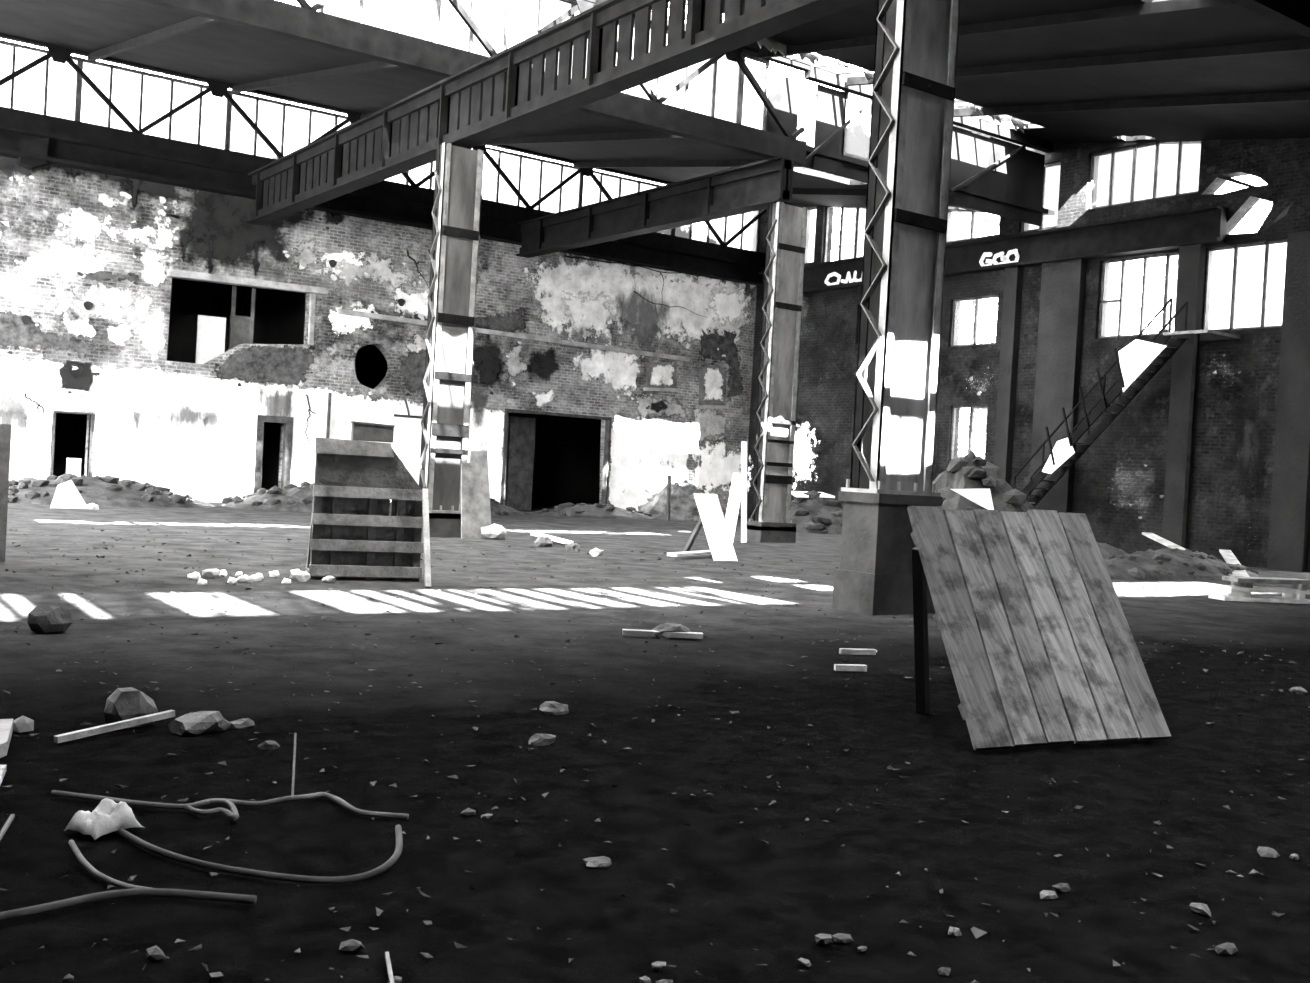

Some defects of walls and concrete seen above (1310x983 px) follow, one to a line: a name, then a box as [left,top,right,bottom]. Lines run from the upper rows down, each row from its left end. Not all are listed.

peeling [0,192,429,502]
peeling [468,253,755,511]